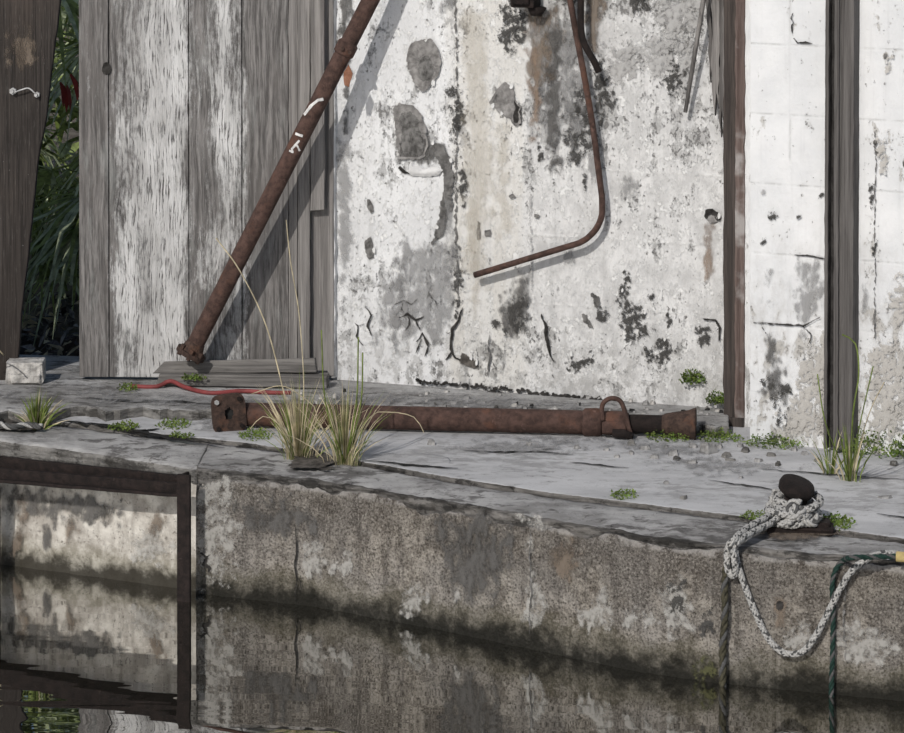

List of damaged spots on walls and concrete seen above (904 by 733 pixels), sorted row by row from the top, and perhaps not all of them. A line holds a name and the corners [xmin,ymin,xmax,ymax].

spalling [406,37,441,92]
spalling [489,82,522,126]
spalling [392,103,454,277]
crack [355,0,614,401]
leakage [594,270,656,375]
crack [753,317,820,346]
peeling [884,272,904,326]
peeling [861,336,904,447]
crack [293,527,301,600]
leakage [400,588,429,618]
leakage [524,573,545,626]
leakage [836,620,900,665]